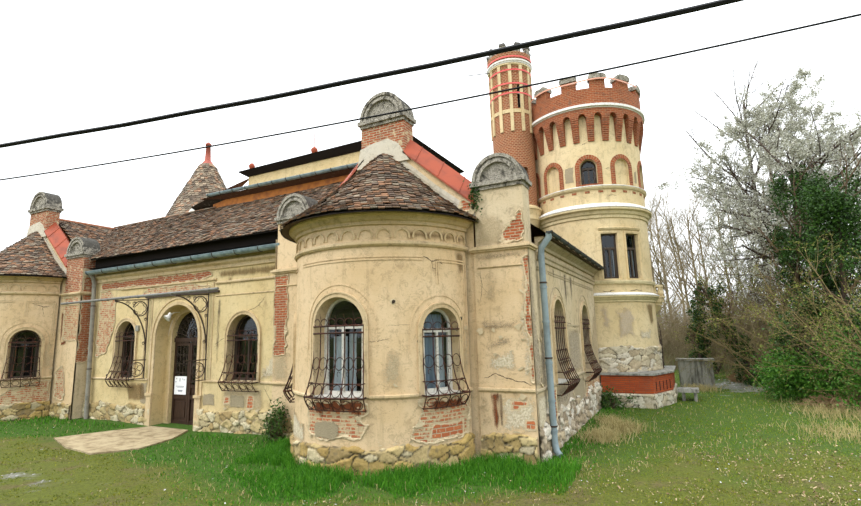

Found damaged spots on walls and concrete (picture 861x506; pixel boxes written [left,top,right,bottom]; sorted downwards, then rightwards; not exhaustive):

flaking render [62,270,212,363]
flaking render [262,274,289,381]
flaking render [458,199,651,433]
flaking render [0,365,65,405]
flaking render [222,385,263,412]
flaking render [293,400,369,442]
flaking render [377,394,472,447]